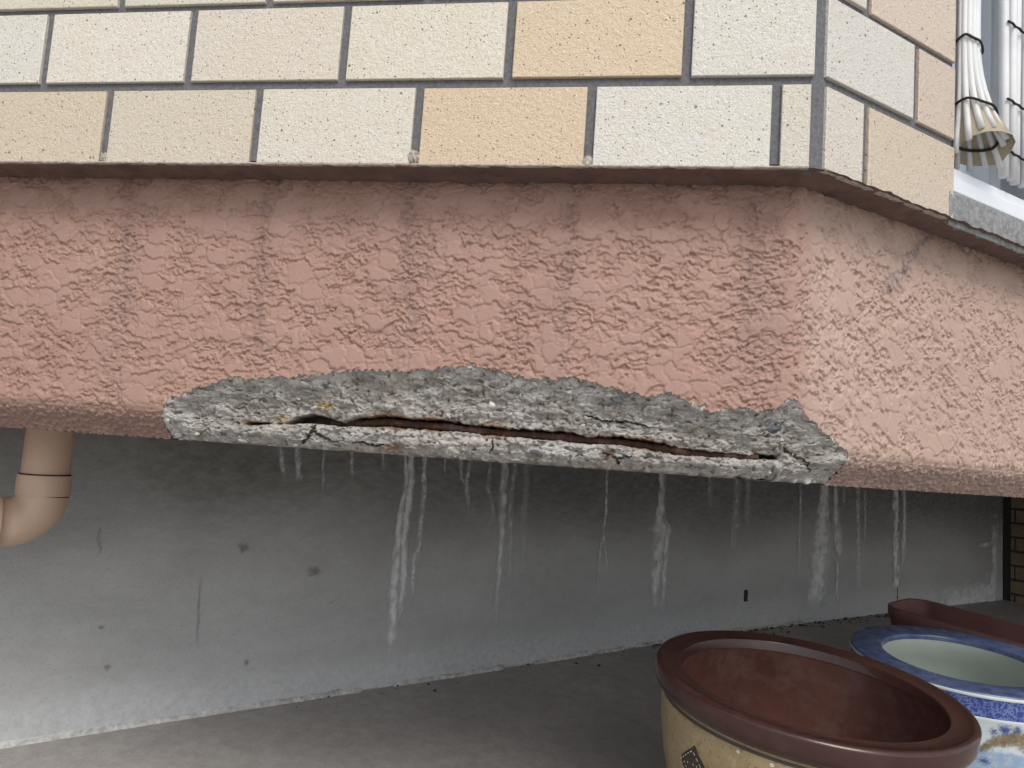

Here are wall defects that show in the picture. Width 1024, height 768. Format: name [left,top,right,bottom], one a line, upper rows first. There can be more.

crack [302,424,384,447]
rust [370,414,531,437]
spalling [161,364,850,485]
crack [583,414,651,428]
crack [603,451,632,465]
rust [597,435,673,458]
leakage [388,456,427,646]
leakage [488,463,516,592]
leakage [652,473,670,599]
leakage [808,485,841,604]
leakage [892,490,906,587]